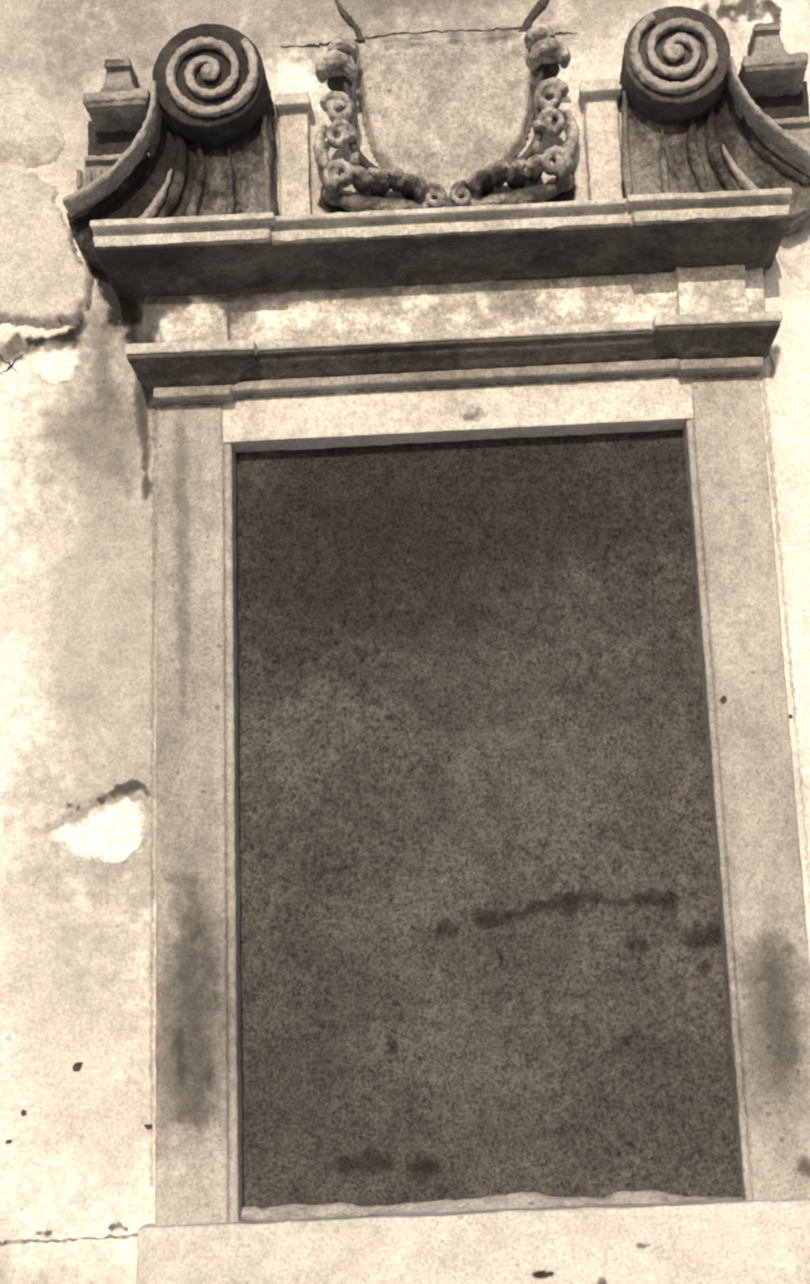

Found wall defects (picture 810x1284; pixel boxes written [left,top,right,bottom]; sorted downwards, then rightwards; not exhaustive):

flaking render [0,163,94,391]
flaking render [50,779,149,863]